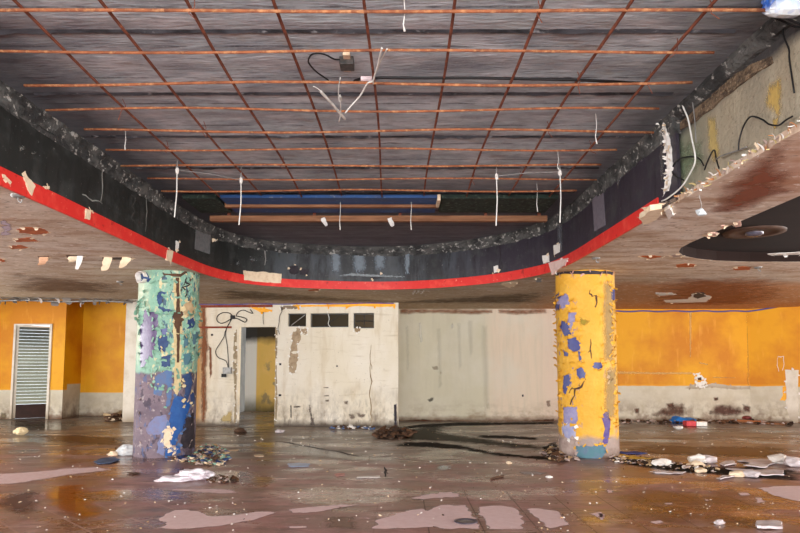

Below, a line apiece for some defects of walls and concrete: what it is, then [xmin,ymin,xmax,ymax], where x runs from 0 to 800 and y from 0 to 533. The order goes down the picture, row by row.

spalling [0,0,766,197]
peeling [638,203,676,225]
spalling [702,220,742,239]
peeling [66,255,85,270]
peeling [101,257,136,271]
peeling [288,326,309,375]
peeling [542,242,621,460]
peeling [0,271,203,458]
crack [367,350,375,426]
crack [569,379,586,405]
water stain [654,403,684,416]
water stain [710,398,750,415]